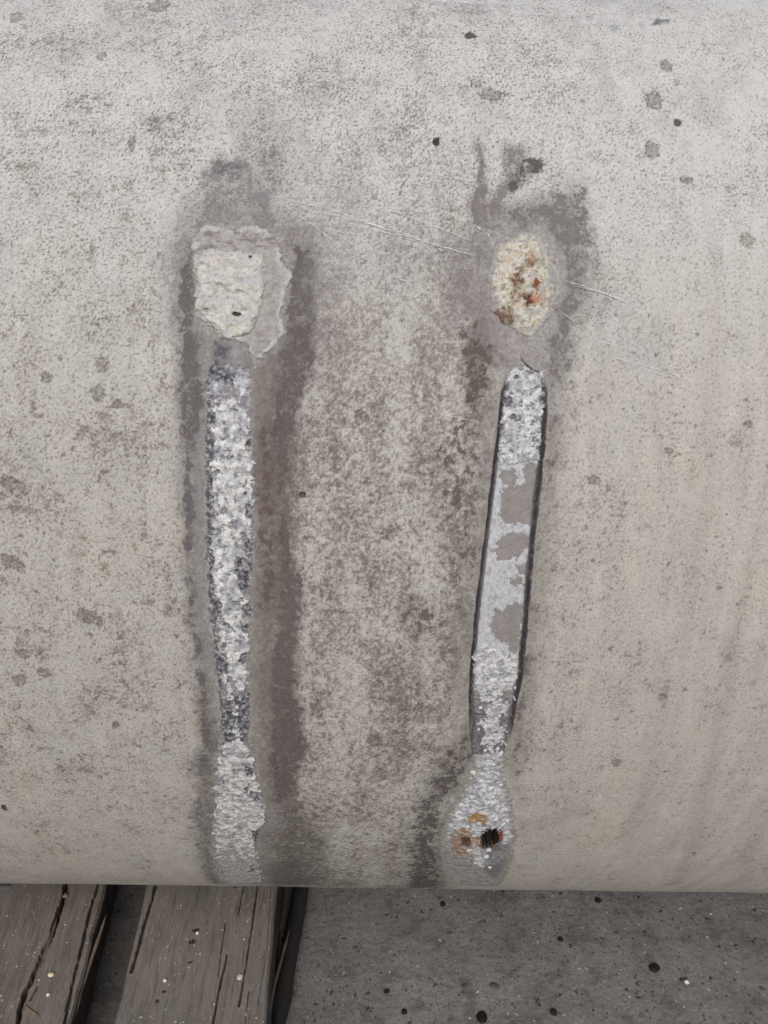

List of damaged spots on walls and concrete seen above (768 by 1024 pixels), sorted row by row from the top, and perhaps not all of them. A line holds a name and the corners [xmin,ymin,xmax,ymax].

rust [494,253,542,325]
leakage [450,144,599,386]
leakage [175,252,205,553]
leakage [183,569,203,655]
leakage [252,242,317,802]
leakage [434,312,508,582]
leakage [188,671,222,883]
leakage [405,729,472,889]
rust [450,813,487,860]